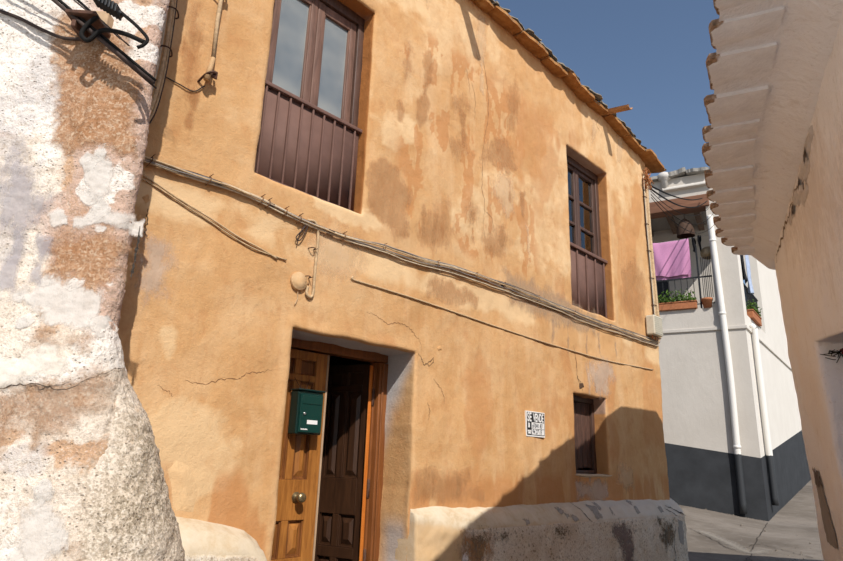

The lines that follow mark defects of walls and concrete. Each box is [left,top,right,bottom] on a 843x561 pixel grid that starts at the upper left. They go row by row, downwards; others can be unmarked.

peeling [48,146,145,236]
crack [369,313,434,366]
crack [0,368,122,390]
crack [187,370,271,385]
leakage [611,521,636,561]
leakage [657,516,675,553]
crack [666,507,813,561]